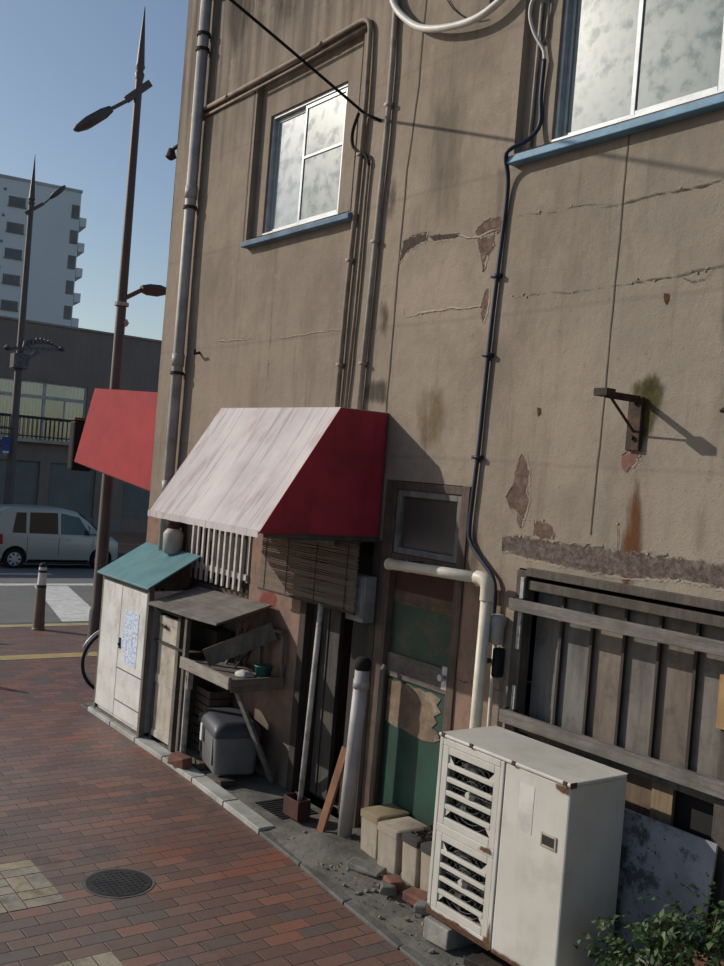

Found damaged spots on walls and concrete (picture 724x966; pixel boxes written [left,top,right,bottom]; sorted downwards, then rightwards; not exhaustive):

crack [520,180,719,216]
peeling [399,230,459,264]
crack [457,228,499,239]
peeling [475,216,502,272]
crack [511,265,724,298]
peeling [480,287,491,323]
spalling [501,450,724,593]
corrosion [623,498,640,555]